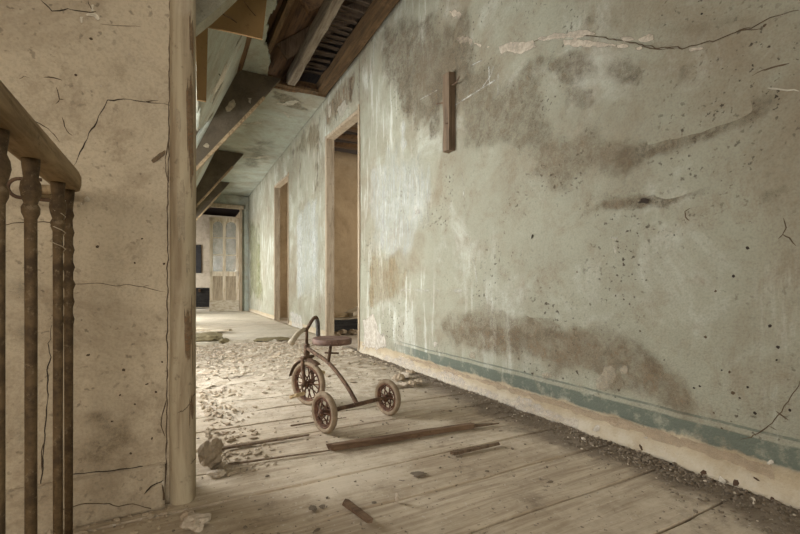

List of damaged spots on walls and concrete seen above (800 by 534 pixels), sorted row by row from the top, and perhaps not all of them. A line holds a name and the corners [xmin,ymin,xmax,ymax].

crack [499,10,799,54]
water stain [326,77,354,123]
crack [20,0,195,510]
water stain [444,314,690,411]
crack [741,381,800,440]